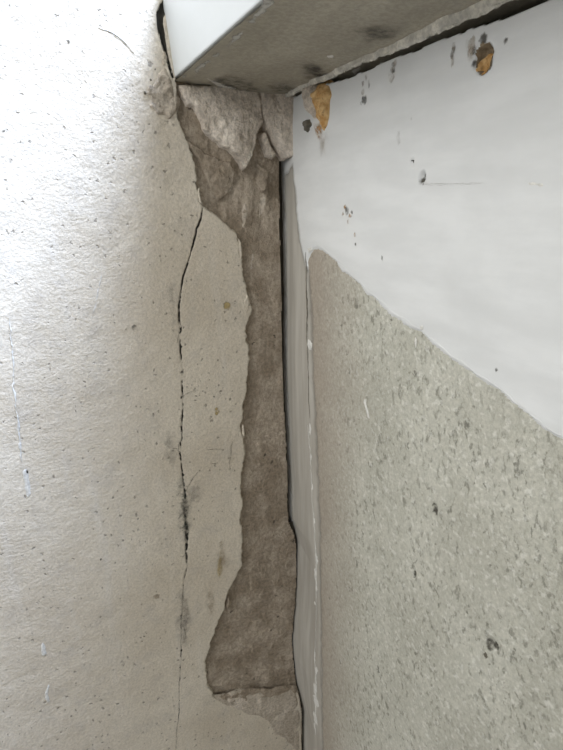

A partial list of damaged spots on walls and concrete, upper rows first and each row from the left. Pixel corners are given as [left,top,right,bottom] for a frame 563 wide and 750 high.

crack [173,208,203,747]
crack [279,161,297,562]
corrosion [302,80,333,137]
peeling [144,49,563,750]